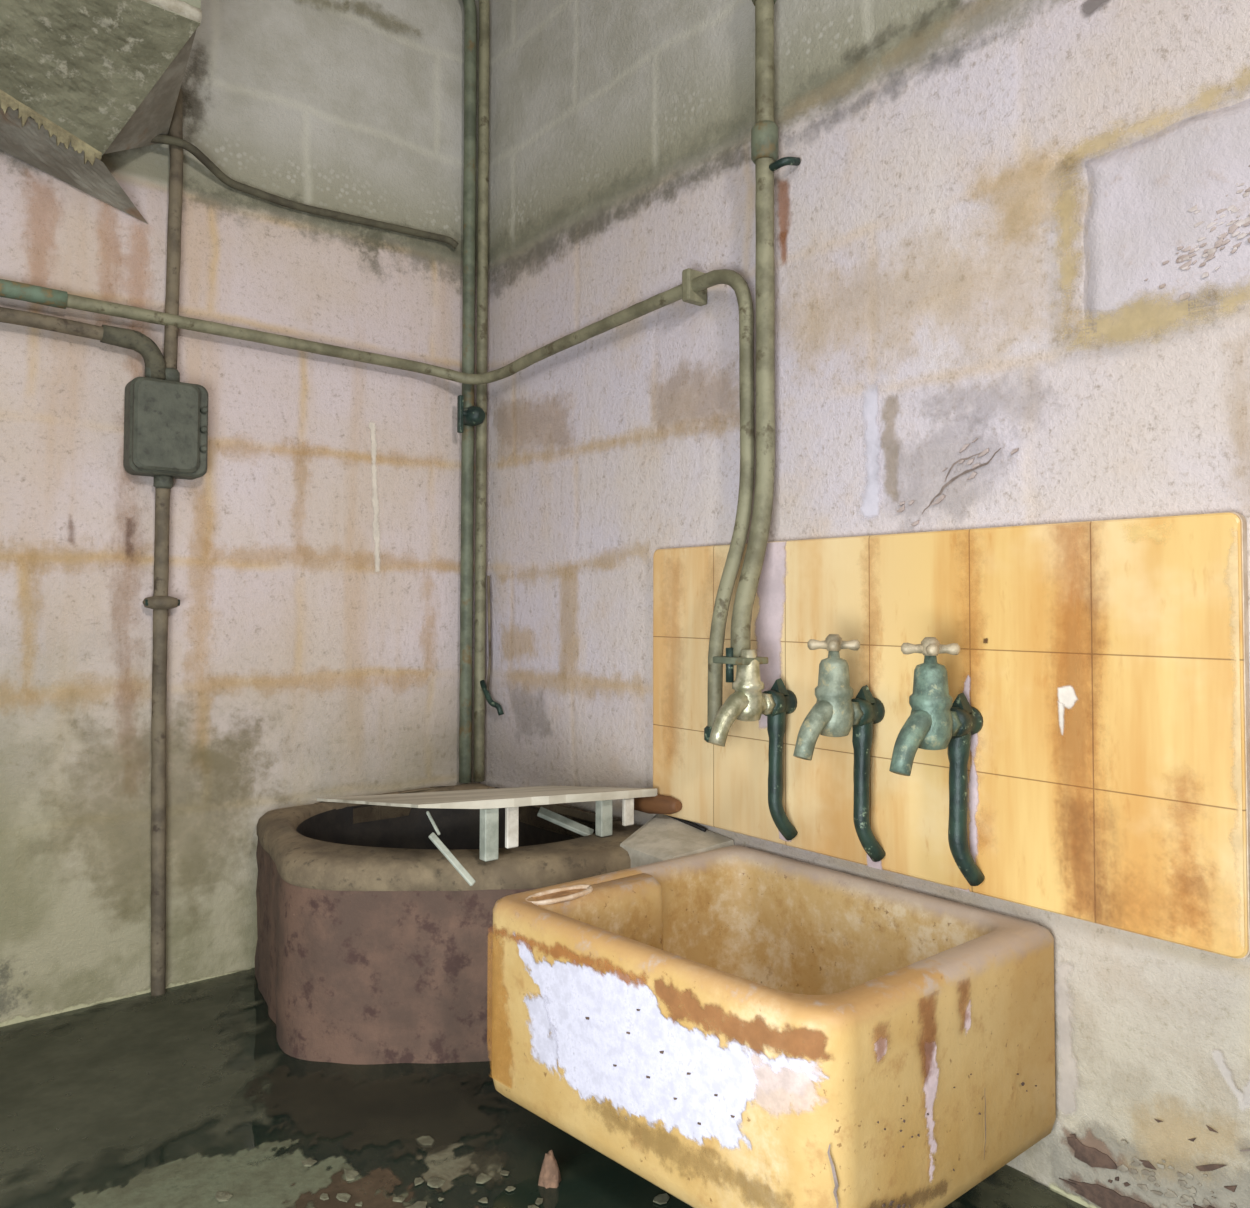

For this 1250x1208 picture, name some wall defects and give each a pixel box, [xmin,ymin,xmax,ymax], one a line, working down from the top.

corrosion [779,182,788,259]
water stain [369,422,380,572]